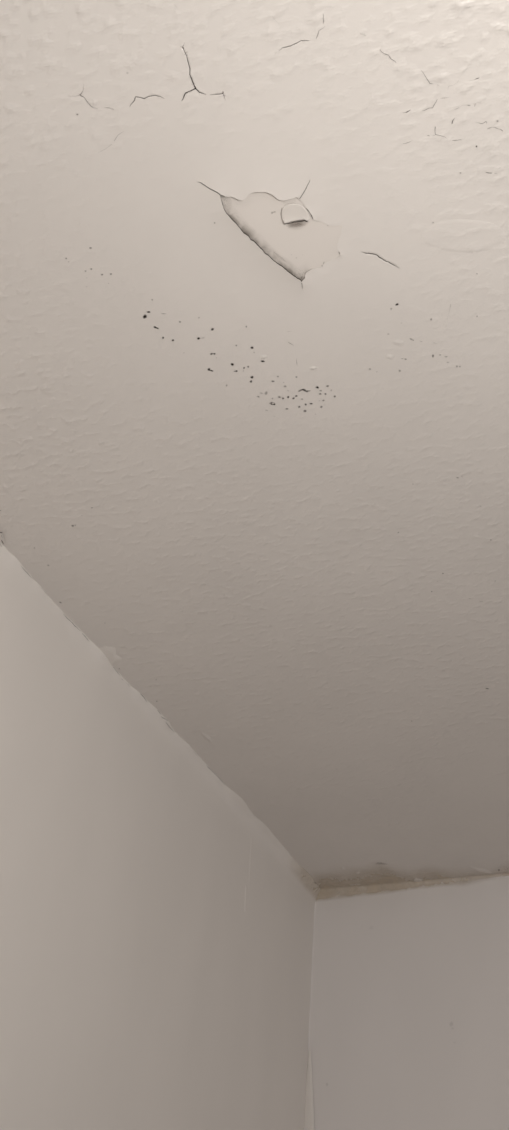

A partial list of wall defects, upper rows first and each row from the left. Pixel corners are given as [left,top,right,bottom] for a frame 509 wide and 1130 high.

crack [275,15,325,53]
crack [69,44,226,110]
peeling [175,149,376,316]
crack [361,250,400,268]